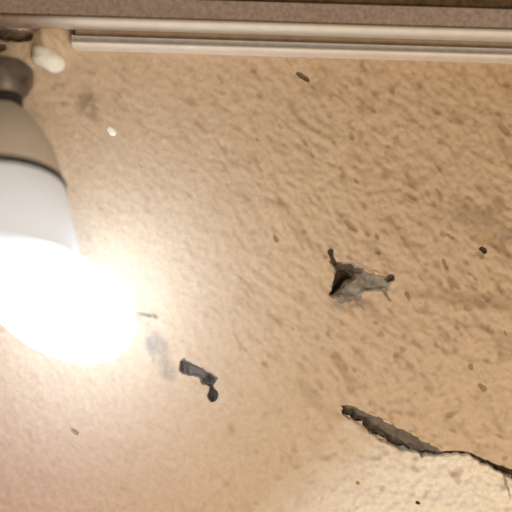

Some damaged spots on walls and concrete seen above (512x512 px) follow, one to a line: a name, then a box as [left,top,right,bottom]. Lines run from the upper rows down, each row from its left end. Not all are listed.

spalling [327,249,395,304]
spalling [179,358,218,402]
crack [341,402,512,490]